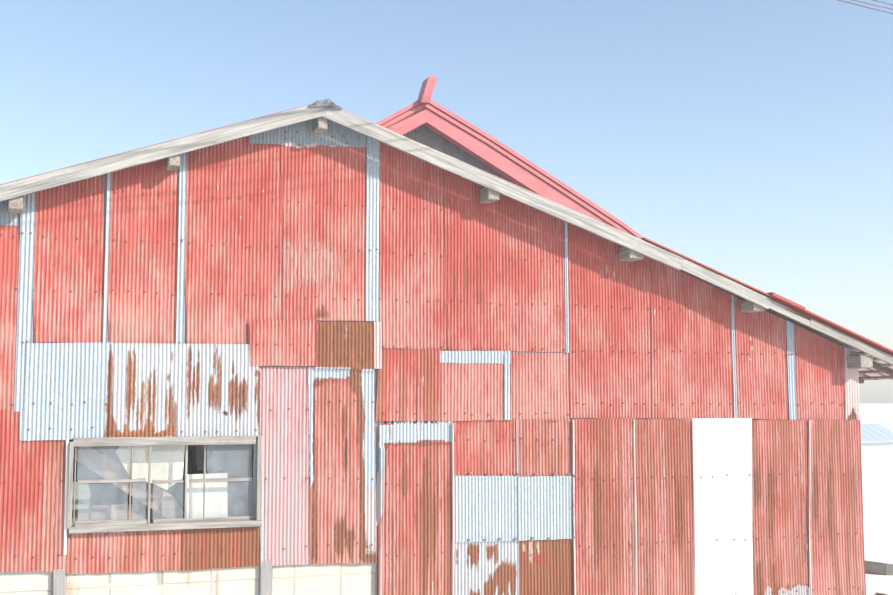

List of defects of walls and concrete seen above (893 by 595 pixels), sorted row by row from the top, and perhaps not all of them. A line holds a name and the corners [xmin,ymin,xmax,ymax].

corrosion [104,346,261,437]
corrosion [311,305,376,564]
corrosion [377,427,450,595]
corrosion [582,469,602,567]
corrosion [674,467,683,547]
corrosion [754,462,775,543]
corrosion [812,464,833,565]
corrosion [456,543,517,595]
corrosion [756,561,795,595]